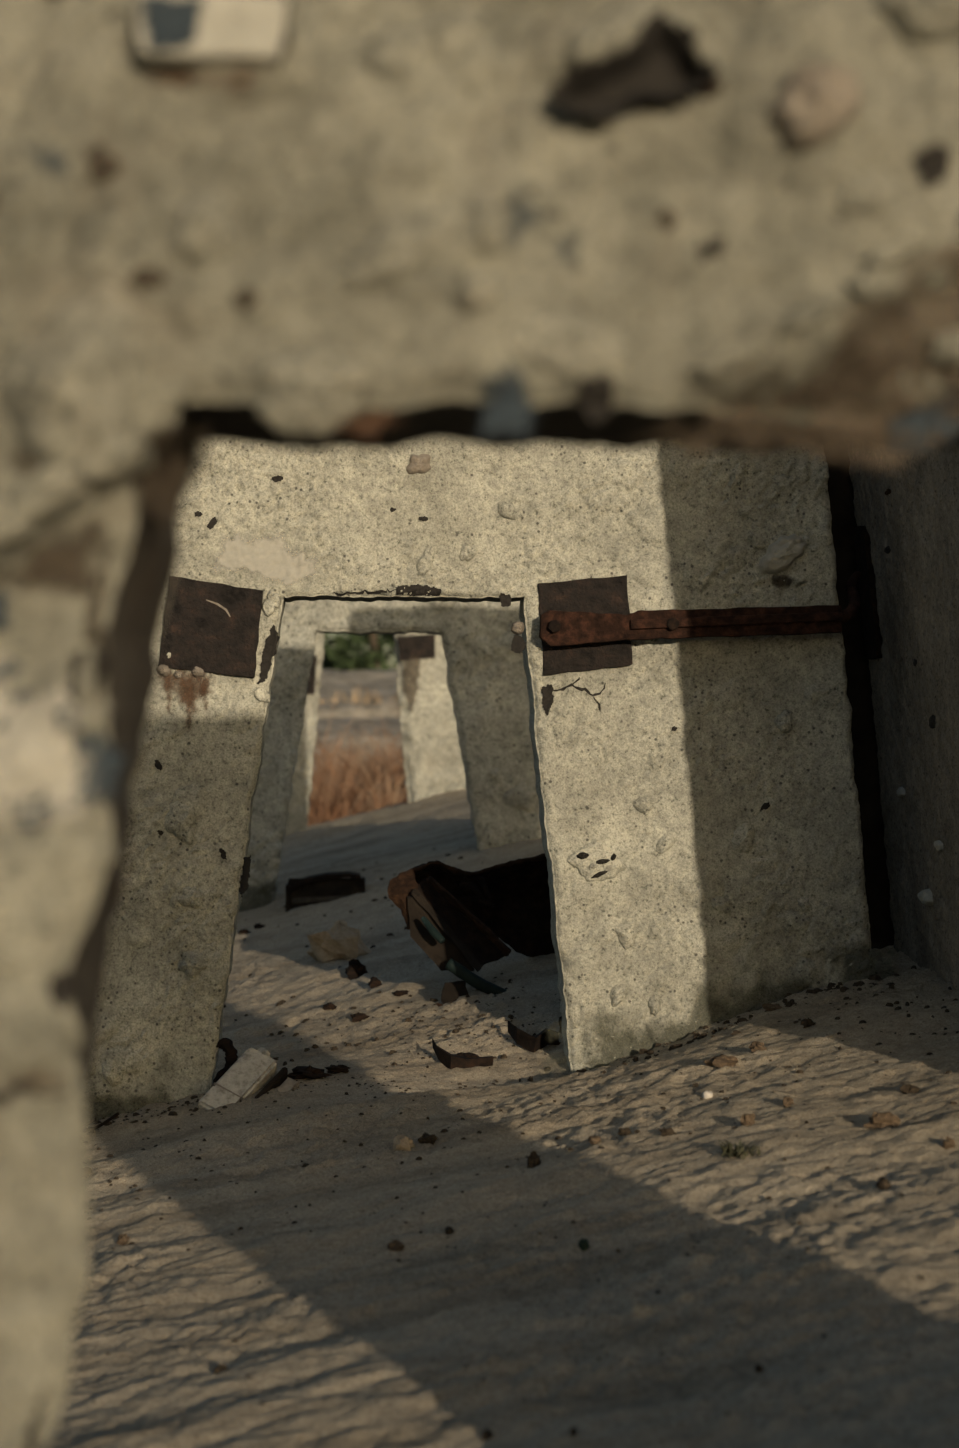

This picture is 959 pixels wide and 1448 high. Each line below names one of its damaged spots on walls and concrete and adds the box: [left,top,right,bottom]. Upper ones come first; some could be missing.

rust [164,670,209,727]
crack [553,677,606,711]